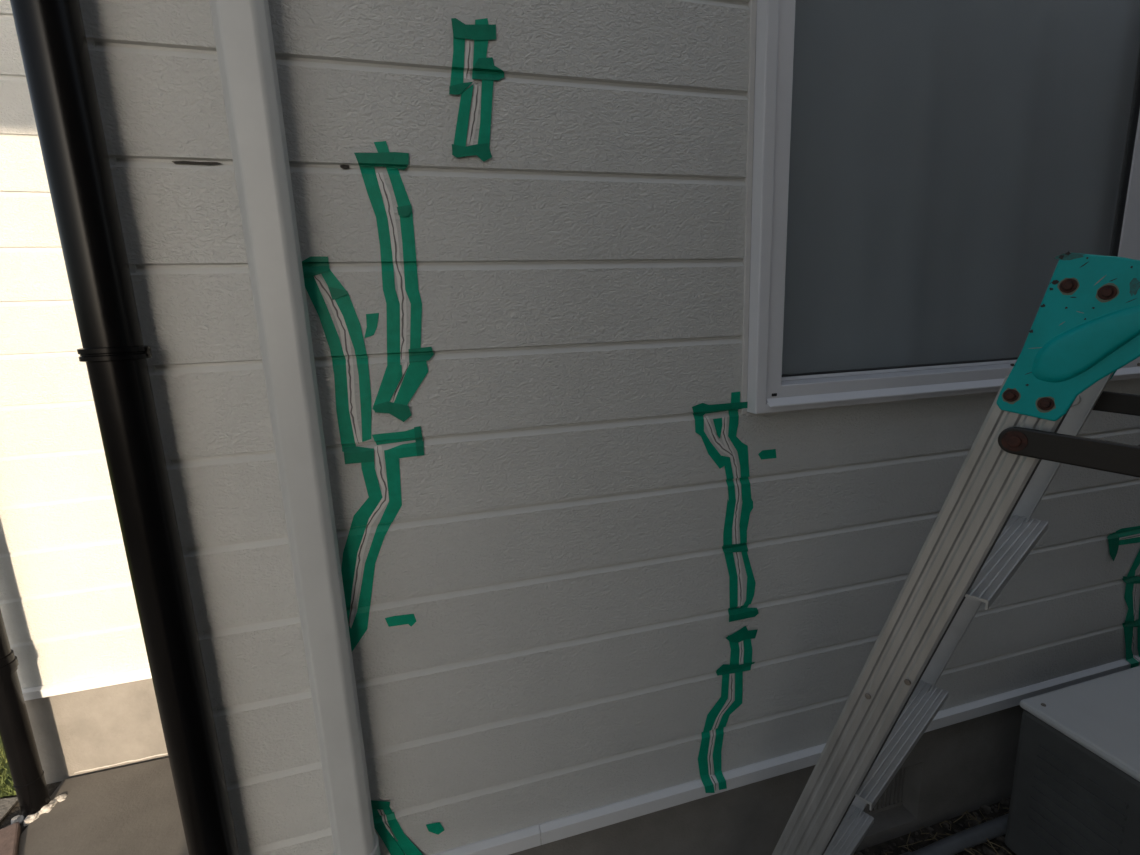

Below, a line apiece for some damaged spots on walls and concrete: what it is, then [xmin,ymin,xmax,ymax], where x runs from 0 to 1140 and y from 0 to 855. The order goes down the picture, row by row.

crack [466,43,478,144]
crack [378,173,408,402]
crack [314,276,387,626]
crack [706,418,742,607]
crack [709,643,742,790]